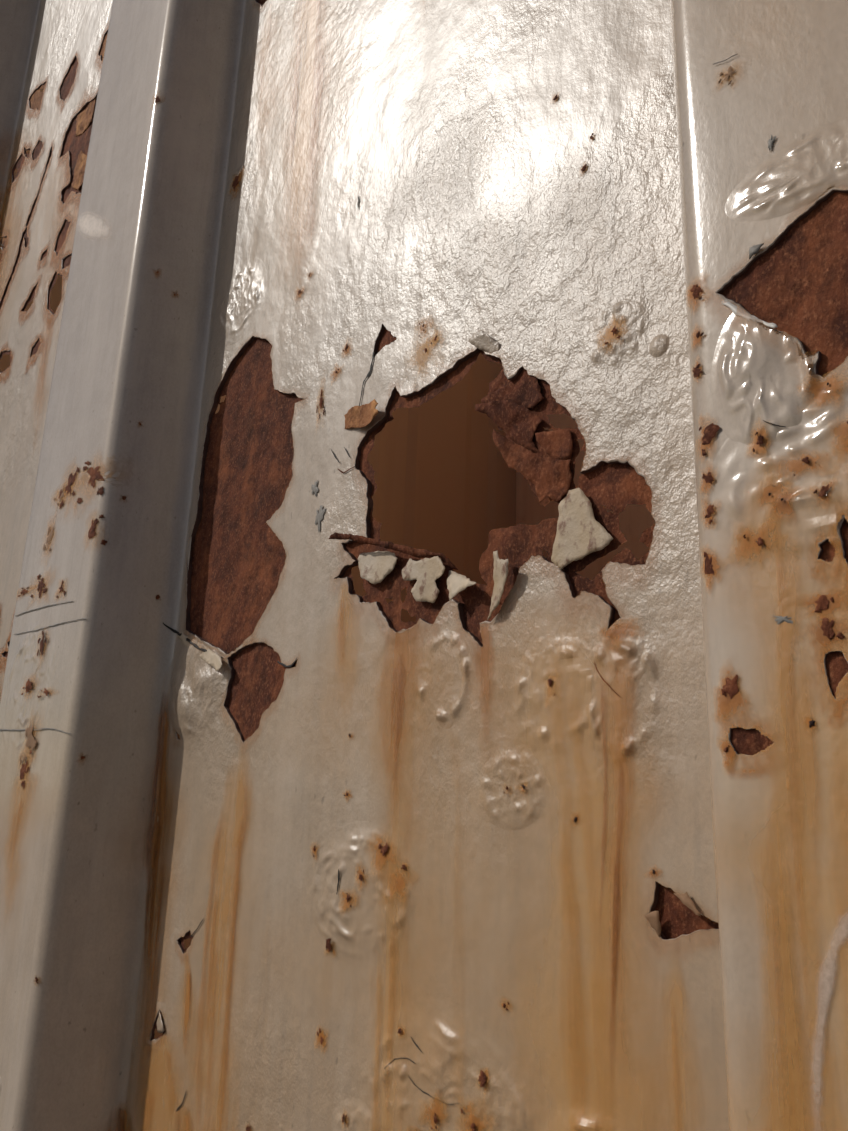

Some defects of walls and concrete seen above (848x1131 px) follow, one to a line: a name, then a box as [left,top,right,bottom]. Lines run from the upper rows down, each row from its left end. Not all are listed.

peeling [38,215,72,279]
corrosion [687,189,848,406]
peeling [475,369,613,570]
corrosion [699,418,720,525]
corrosion [735,420,848,562]
peeling [358,551,445,603]
peeling [487,551,509,621]
corrosion [703,552,720,587]
corrosion [717,671,748,719]
peeling [723,716,775,773]
corrosion [756,481,848,1131]
peeling [644,881,719,940]